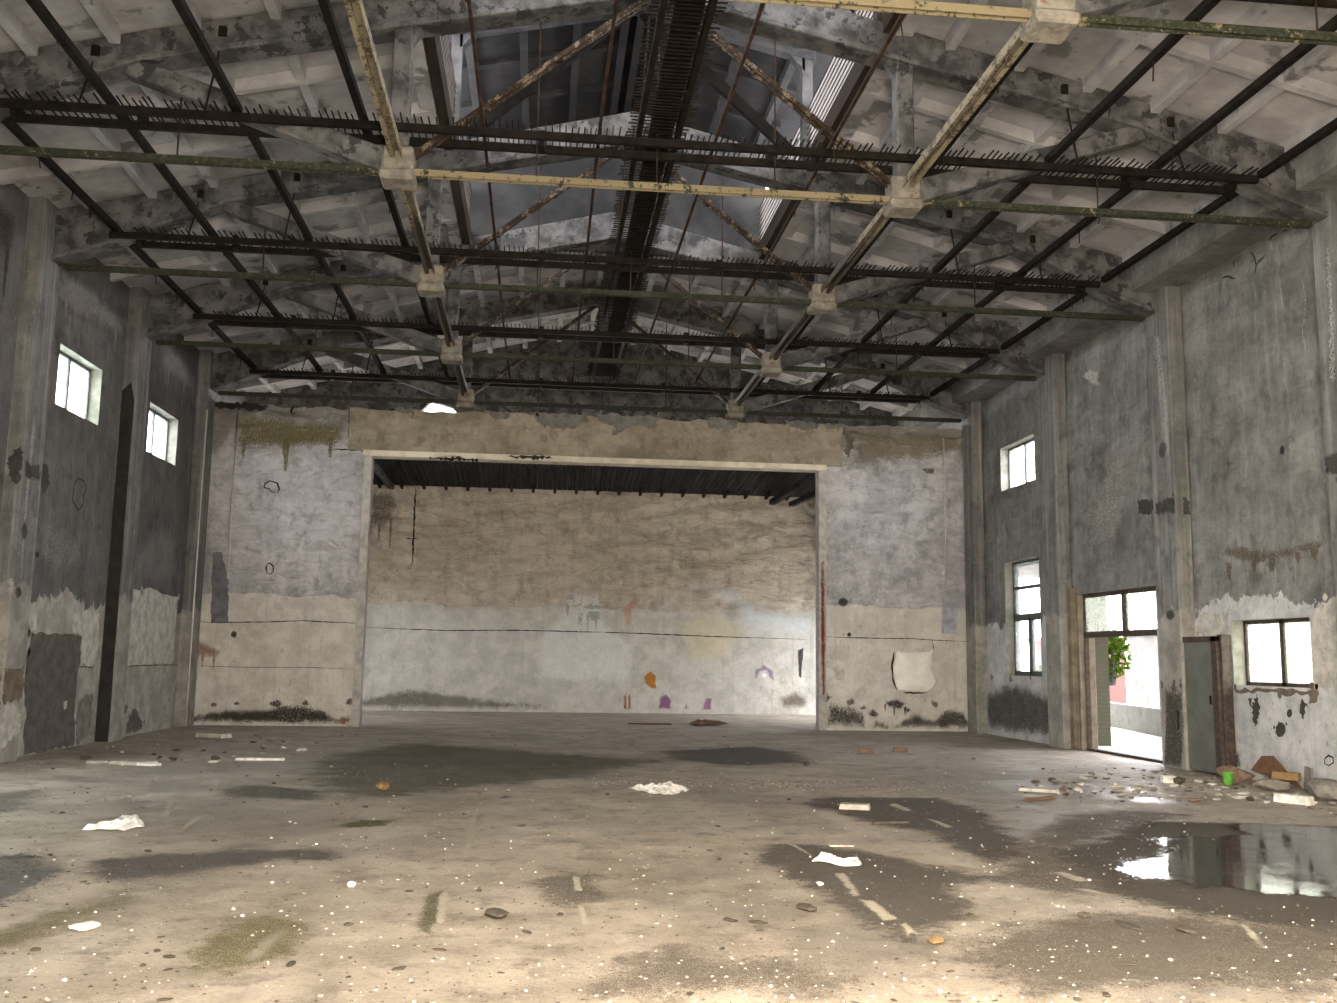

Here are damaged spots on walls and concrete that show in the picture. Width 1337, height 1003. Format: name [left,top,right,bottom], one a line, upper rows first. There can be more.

water stain [282,440,290,472]
flaking render [0,586,99,755]
peeling [1234,593,1337,737]